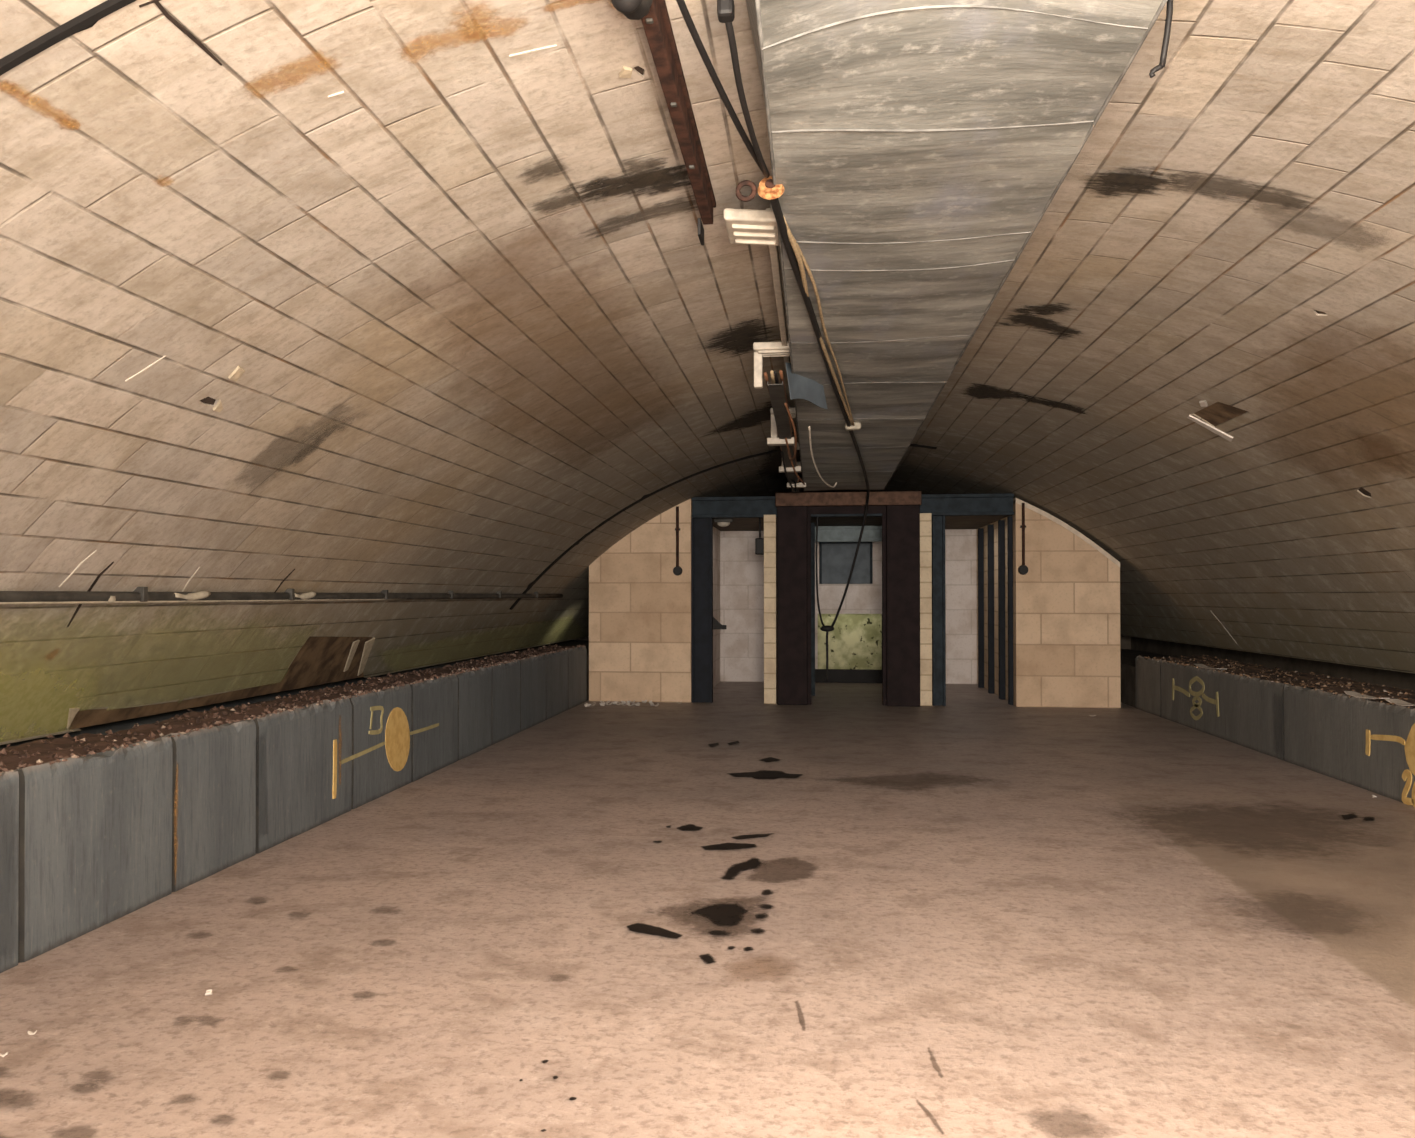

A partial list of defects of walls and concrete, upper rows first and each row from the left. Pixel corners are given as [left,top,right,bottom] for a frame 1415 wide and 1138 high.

corrosion [405,7,521,59]
corrosion [247,54,333,96]
corrosion [0,83,76,129]
leakage [522,159,697,238]
leakage [1085,168,1310,208]
leakage [704,318,778,356]
leakage [1000,303,1080,339]
leakage [706,402,772,436]
leakage [963,383,1085,414]
leakage [758,432,802,483]